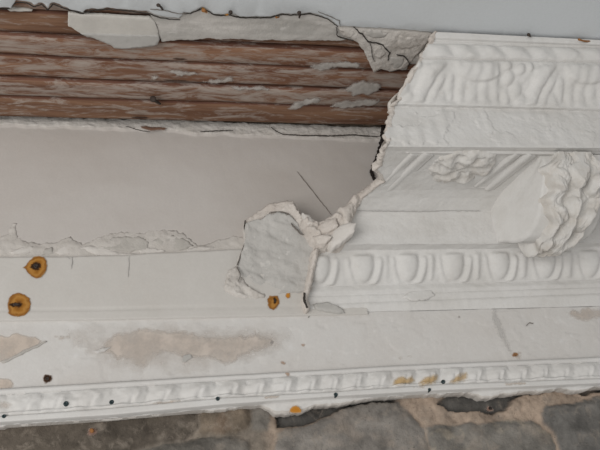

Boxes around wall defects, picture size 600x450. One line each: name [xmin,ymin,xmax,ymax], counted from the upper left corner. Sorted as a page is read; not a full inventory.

peeling [68,11,160,49]
crack [0,2,410,65]
spalling [0,27,437,314]
crack [271,125,385,180]
rust [23,256,47,278]
rust [8,293,31,317]
rust [267,293,290,310]